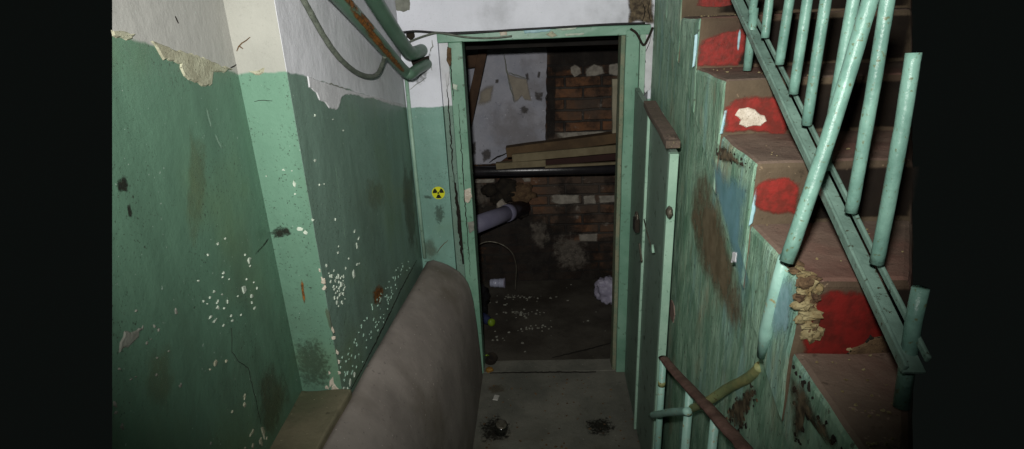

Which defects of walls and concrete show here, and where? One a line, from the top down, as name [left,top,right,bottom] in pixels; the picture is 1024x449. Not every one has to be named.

peeling [111,30,135,41]
peeling [150,41,232,87]
peeling [307,76,404,120]
peeling [119,325,160,352]
peeling [203,254,258,327]
peeling [319,245,360,307]
peeling [325,261,410,390]
spalling [772,259,825,345]